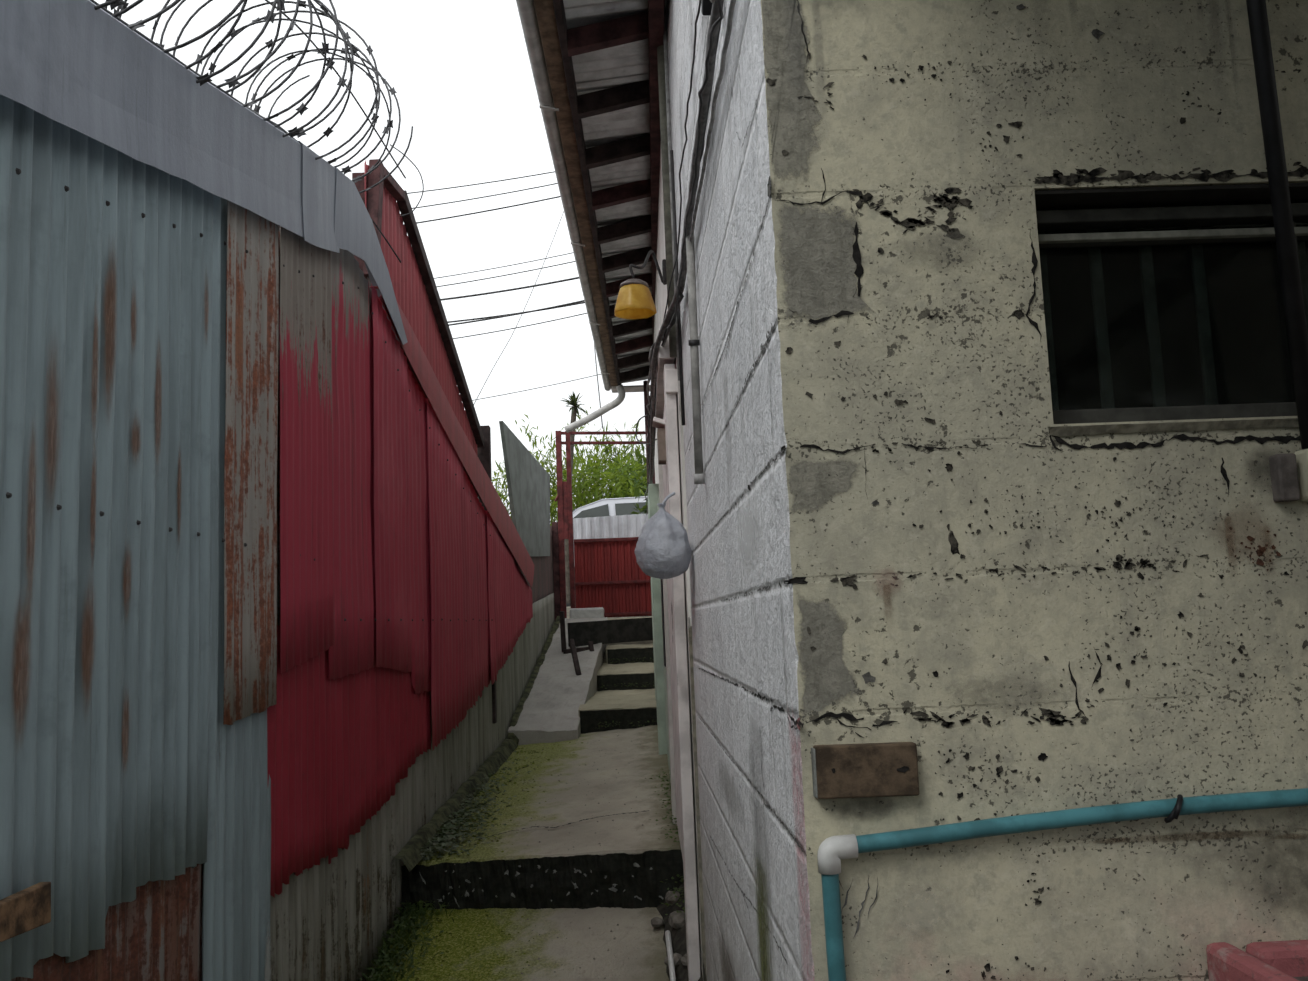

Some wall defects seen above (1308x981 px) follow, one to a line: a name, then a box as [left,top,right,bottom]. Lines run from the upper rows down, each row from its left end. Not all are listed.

crack [1033,168,1308,186]
crack [1018,237,1042,341]
rust [92,262,115,424]
crack [689,168,884,551]
crack [902,443,977,451]
crack [1018,431,1300,495]
rust [13,367,57,730]
rust [11,864,203,981]
damp [757,895,765,981]